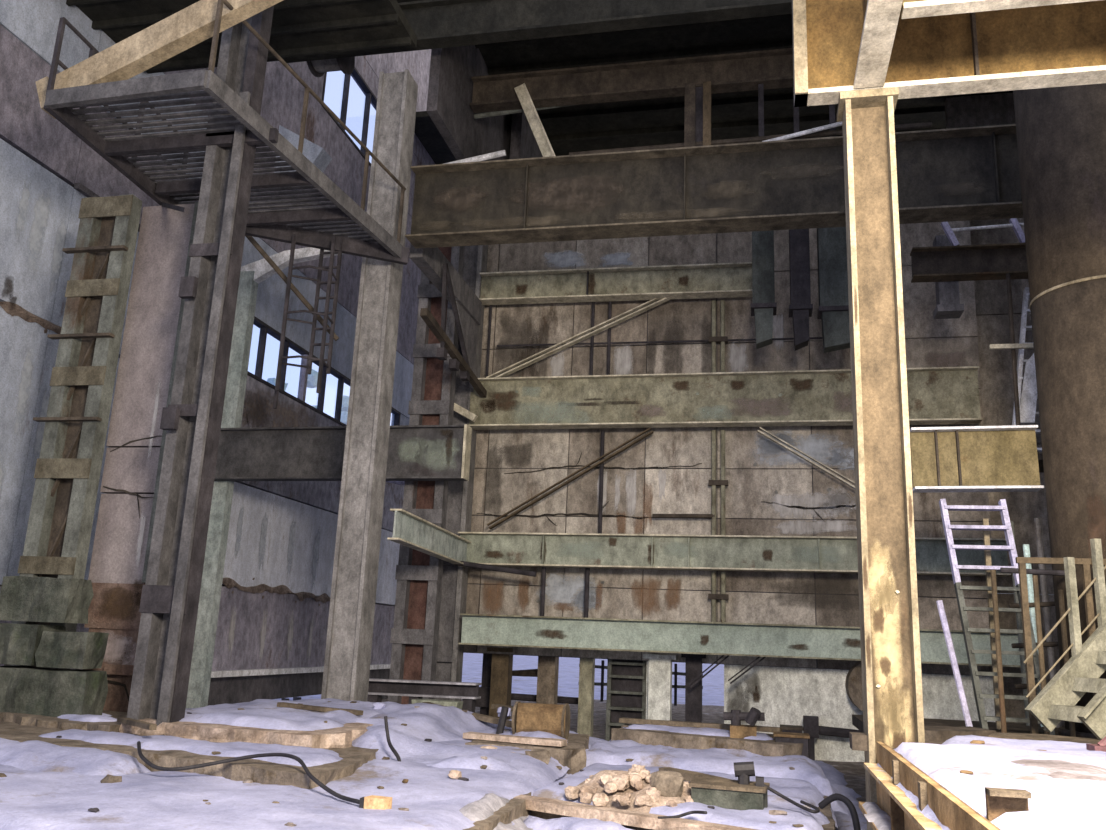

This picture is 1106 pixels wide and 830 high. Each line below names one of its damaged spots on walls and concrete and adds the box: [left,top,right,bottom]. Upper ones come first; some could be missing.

crack [110,436,162,452]
crack [103,486,153,519]
rust [518,581,529,607]
rust [632,580,680,611]